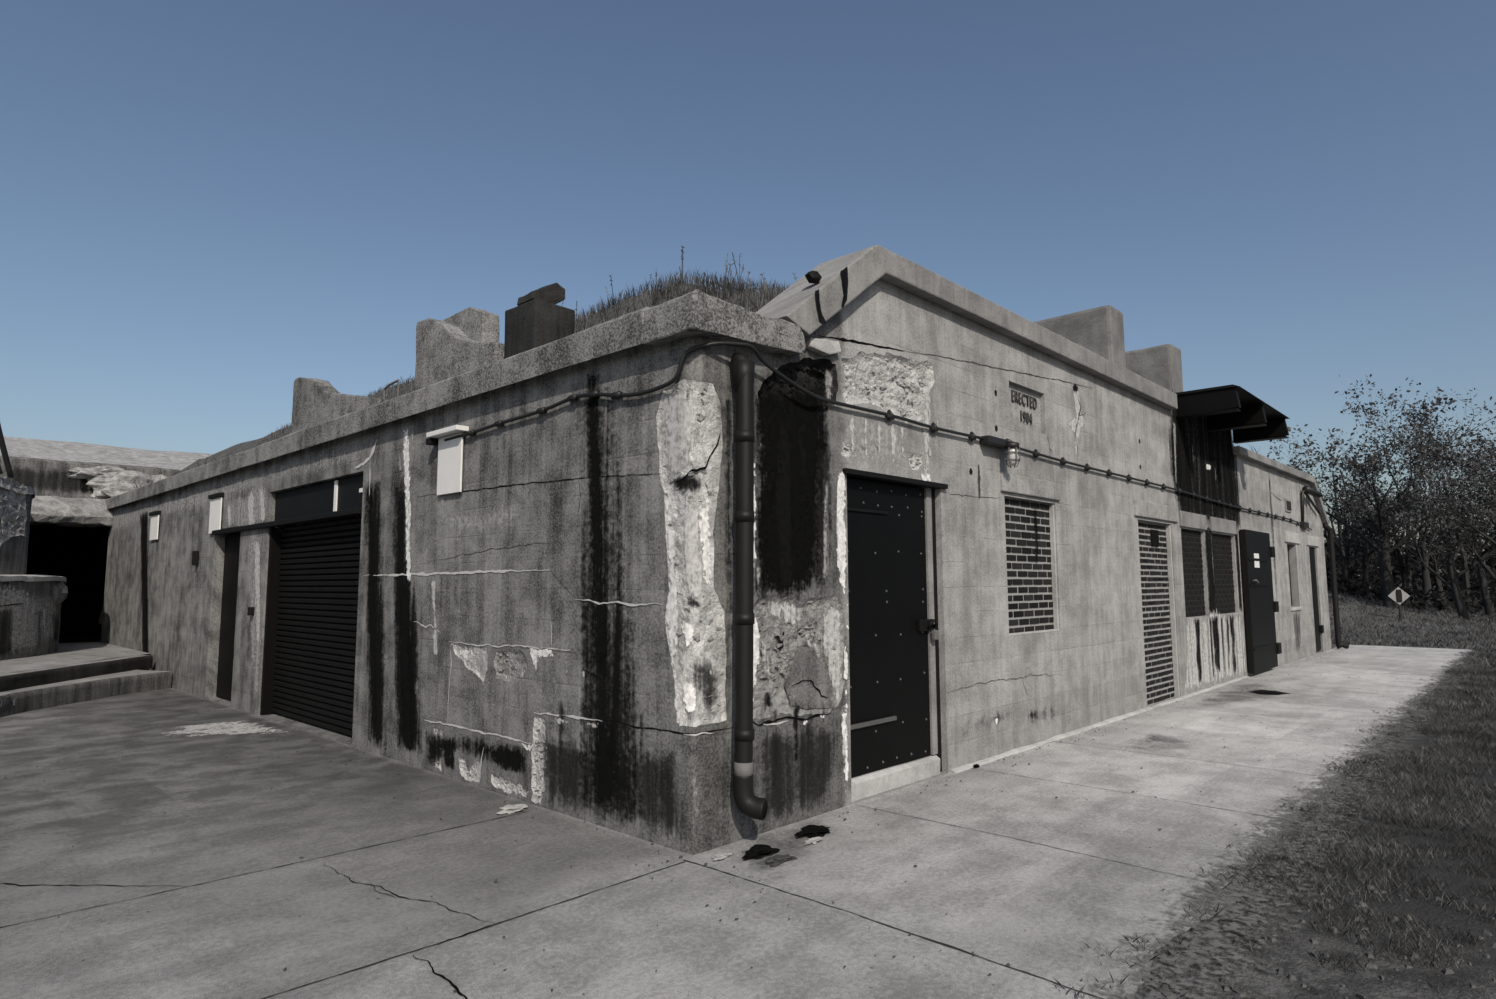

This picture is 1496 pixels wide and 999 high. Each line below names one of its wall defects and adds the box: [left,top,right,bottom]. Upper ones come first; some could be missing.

spalling [0,477,27,546]
water stain [363,426,526,773]
water stain [530,374,677,835]
spalling [656,379,727,727]
water stain [723,400,732,612]
spalling [753,594,845,719]
water stain [762,625,849,817]
water stain [754,379,938,606]
spalling [758,351,935,423]
water stain [1169,390,1245,689]
crack [4,880,174,888]
crack [324,864,493,999]